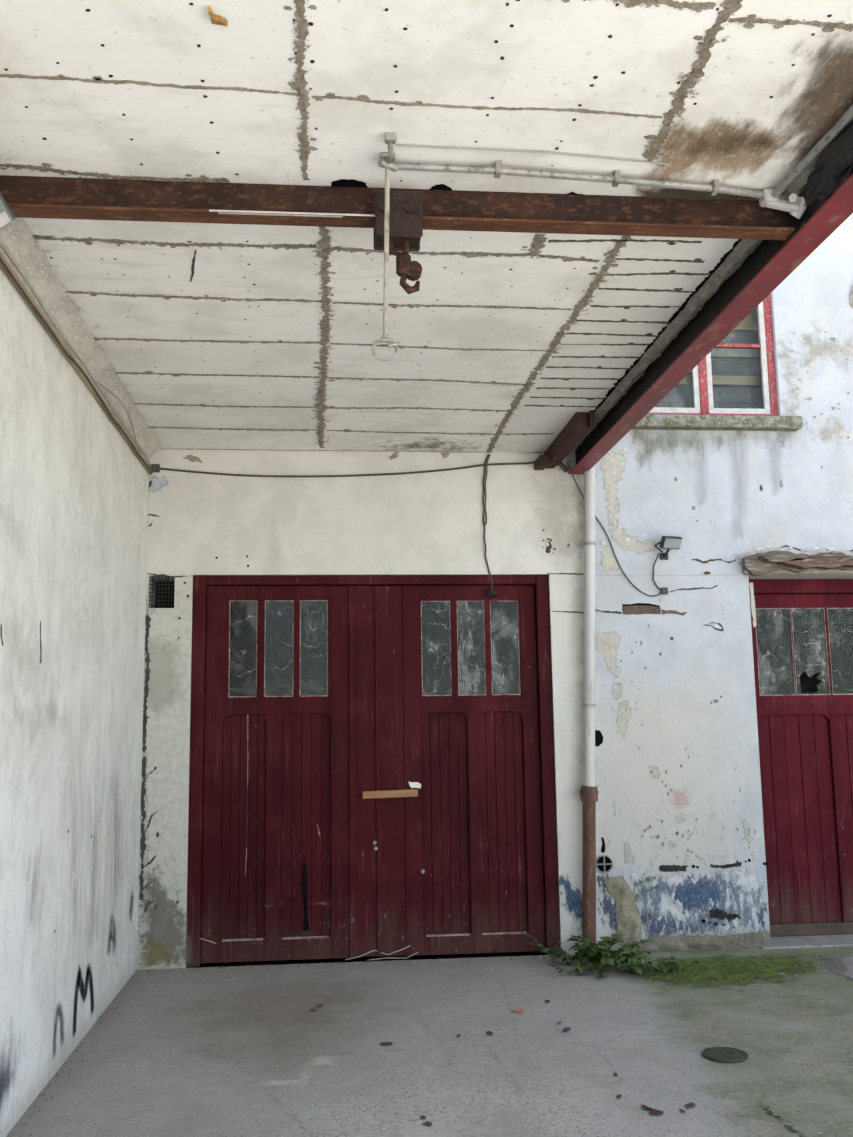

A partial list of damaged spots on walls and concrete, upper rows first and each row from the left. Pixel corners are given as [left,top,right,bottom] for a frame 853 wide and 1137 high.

peeling [599,447,656,573]
spalling [738,545,853,564]
flaking render [595,603,688,627]
peeling [595,631,643,747]
spalling [624,813,771,952]